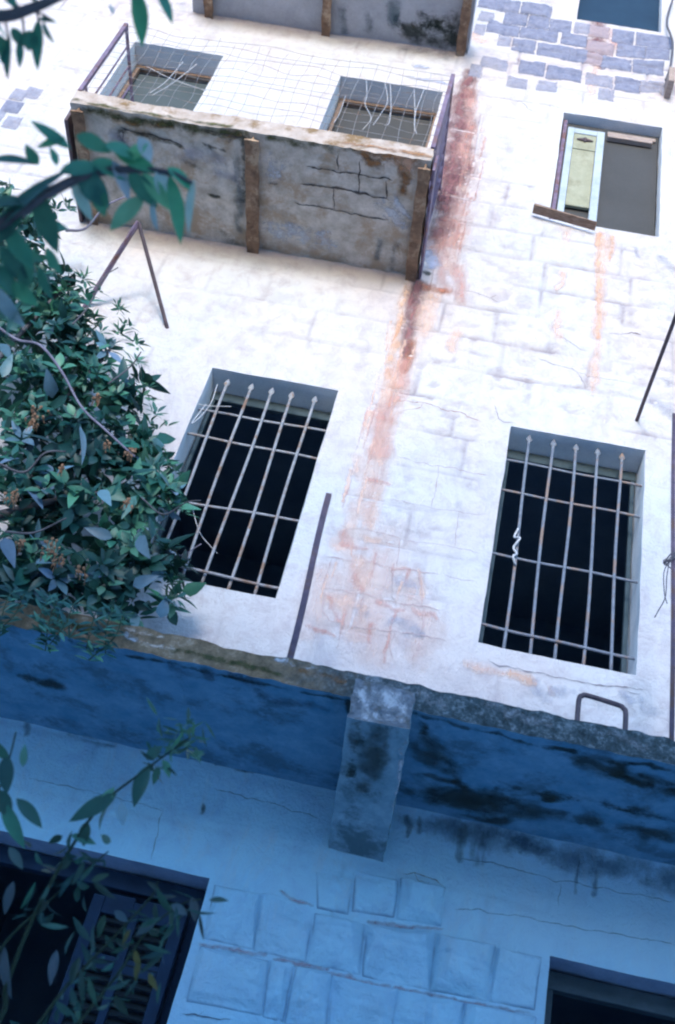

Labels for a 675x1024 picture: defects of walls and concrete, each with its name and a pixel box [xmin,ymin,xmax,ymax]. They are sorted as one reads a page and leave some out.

water stain [394,13,460,49]
spalling [468,0,672,102]
crack [295,157,393,221]
corrosion [354,149,419,194]
corrosion [431,69,476,242]
corrosion [386,278,448,406]
water stain [346,727,386,788]
water stain [414,716,625,873]
water stain [548,747,675,795]
water stain [603,803,674,842]
crack [460,858,672,943]